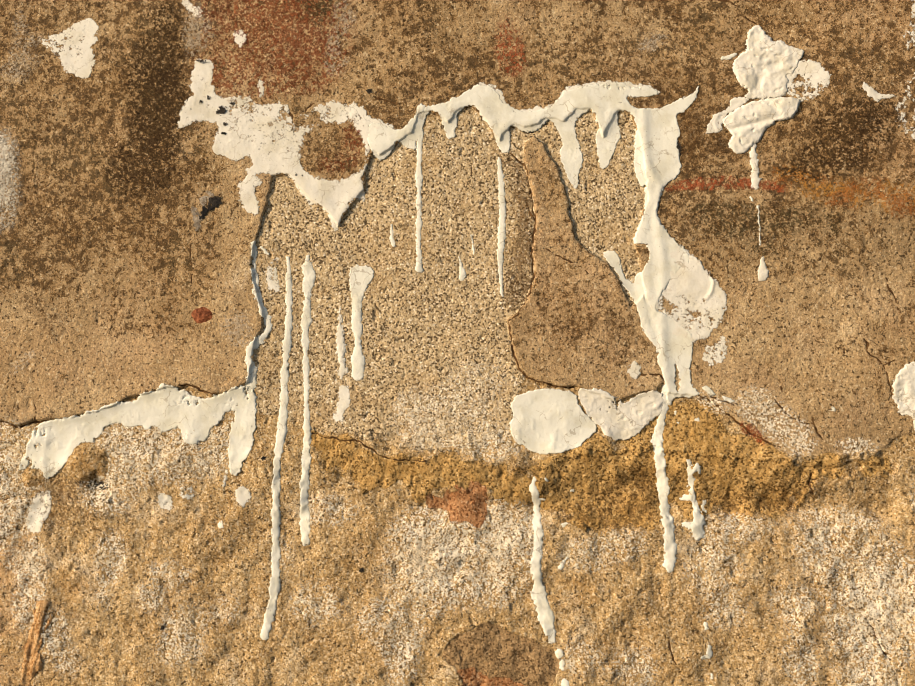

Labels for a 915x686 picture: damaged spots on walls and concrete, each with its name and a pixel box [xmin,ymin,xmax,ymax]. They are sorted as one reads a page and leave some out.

corrosion [200,0,349,95]
peeling [706,25,831,190]
corrosion [666,166,915,217]
crack [508,153,589,388]
corrosion [191,307,212,323]
spalling [18,59,846,573]
crack [178,384,215,395]
crack [0,404,57,429]
crack [311,433,427,462]
spalling [857,451,894,480]